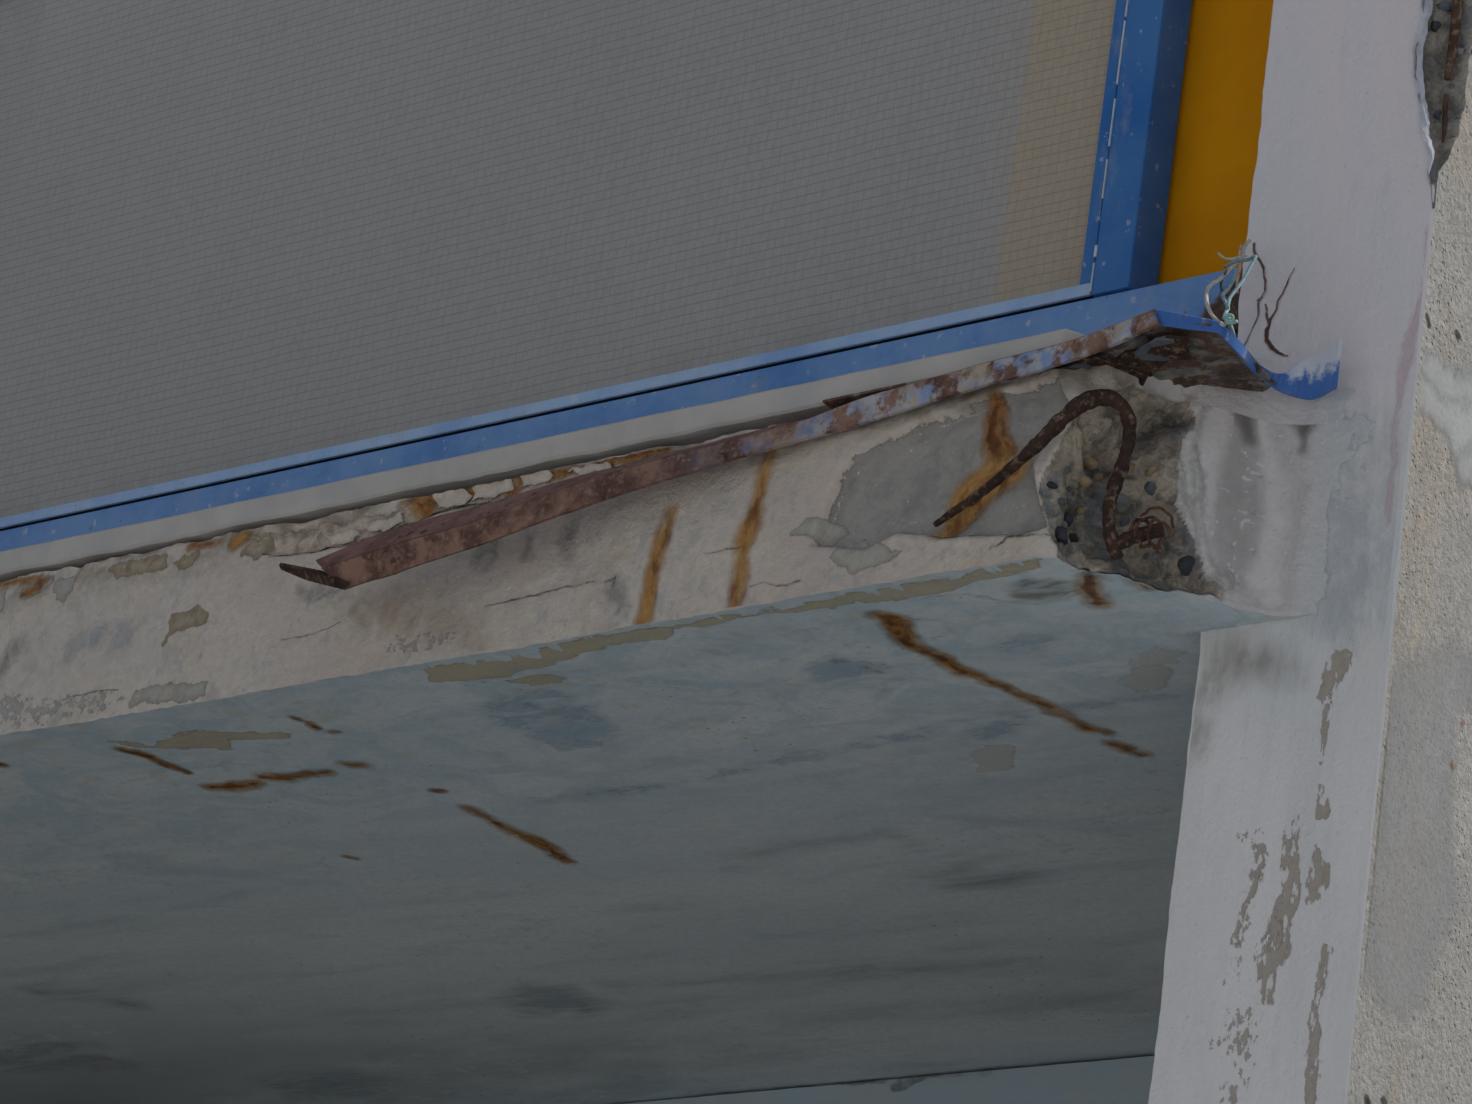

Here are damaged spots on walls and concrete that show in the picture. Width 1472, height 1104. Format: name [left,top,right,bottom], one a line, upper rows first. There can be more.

crack [1244,242,1295,357]
spalling [240,462,613,560]
rust [636,509,674,625]
rust [730,450,775,607]
spalling [388,379,1224,686]
rust [941,392,1029,538]
peeling [161,604,209,647]
rust [871,612,1146,757]
peeling [1316,649,1352,765]
rust [203,763,365,790]
rust [463,806,572,863]
peeling [1209,784,1333,1104]